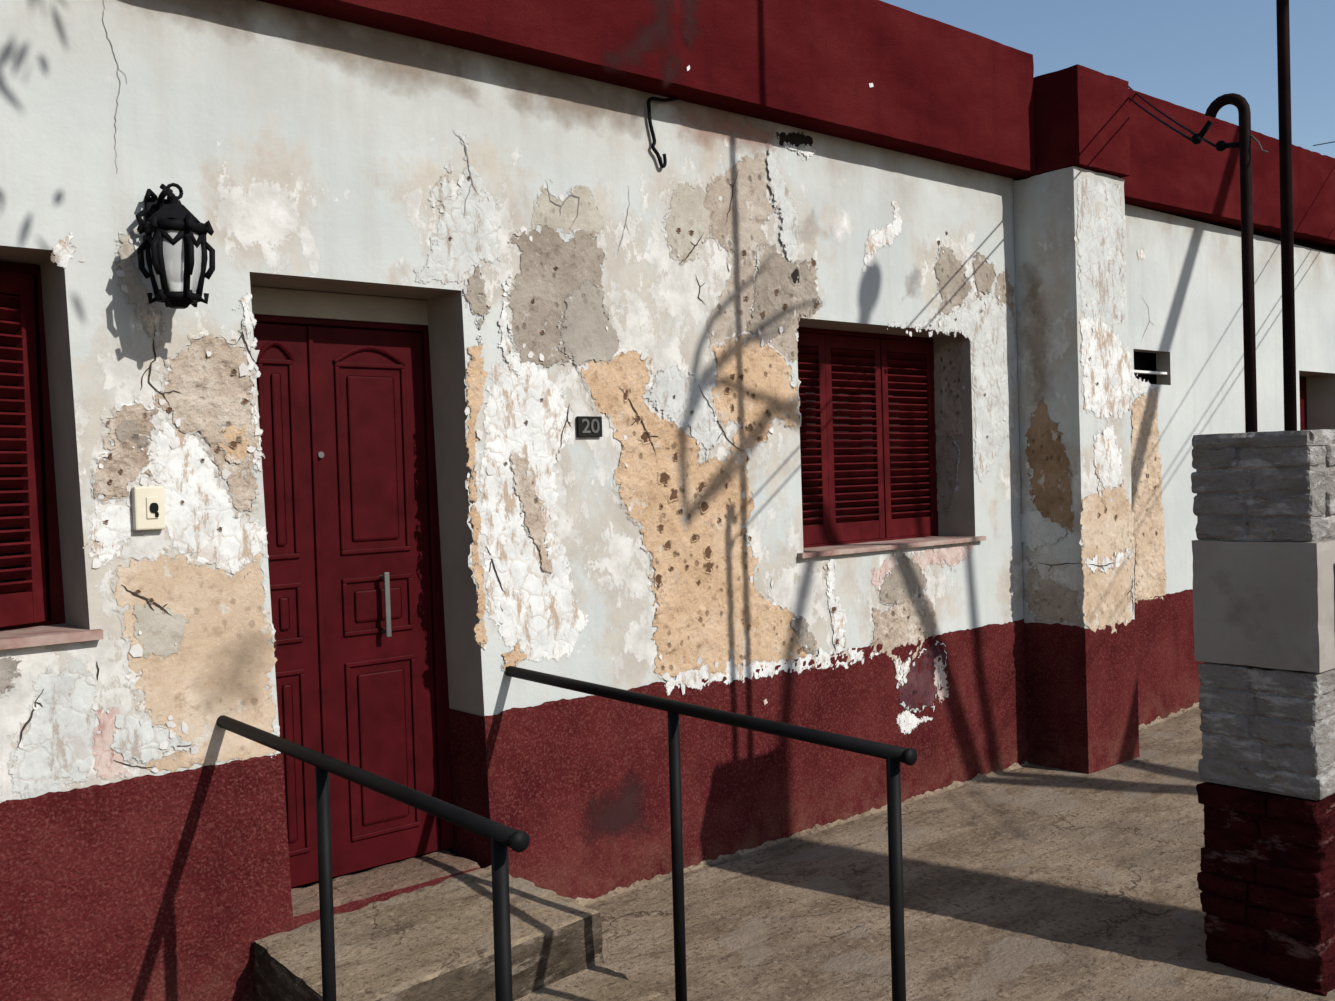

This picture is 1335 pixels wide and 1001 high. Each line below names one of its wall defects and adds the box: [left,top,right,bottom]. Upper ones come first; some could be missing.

crack [102,0,127,170]
spalling [0,229,280,802]
spalling [414,130,975,734]
peeling [887,175,1167,633]